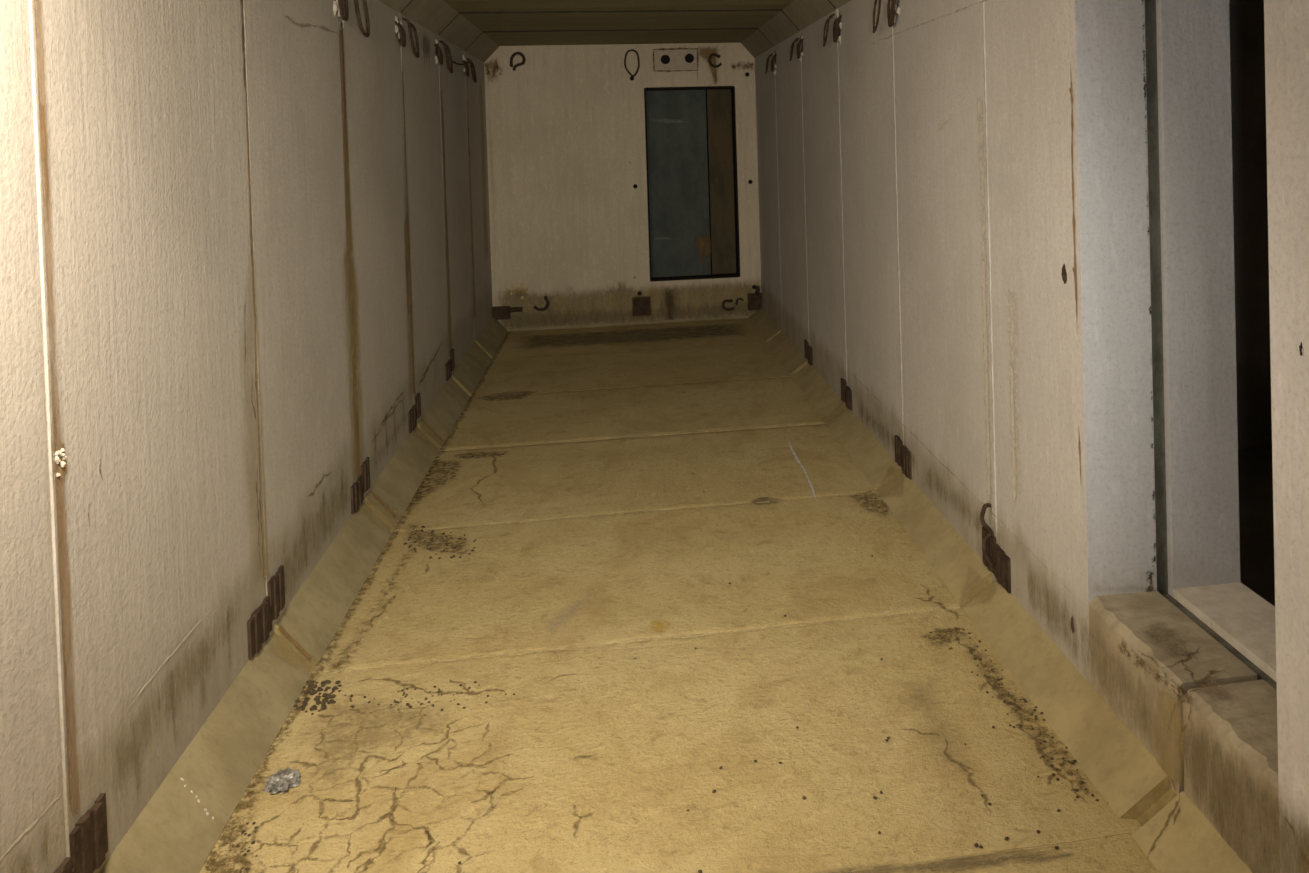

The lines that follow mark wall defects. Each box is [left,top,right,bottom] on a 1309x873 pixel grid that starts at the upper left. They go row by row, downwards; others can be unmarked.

rust [35,0,79,811]
rust [339,28,361,480]
crack [235,678,531,873]
water stain [206,286,757,873]
crack [900,729,991,813]